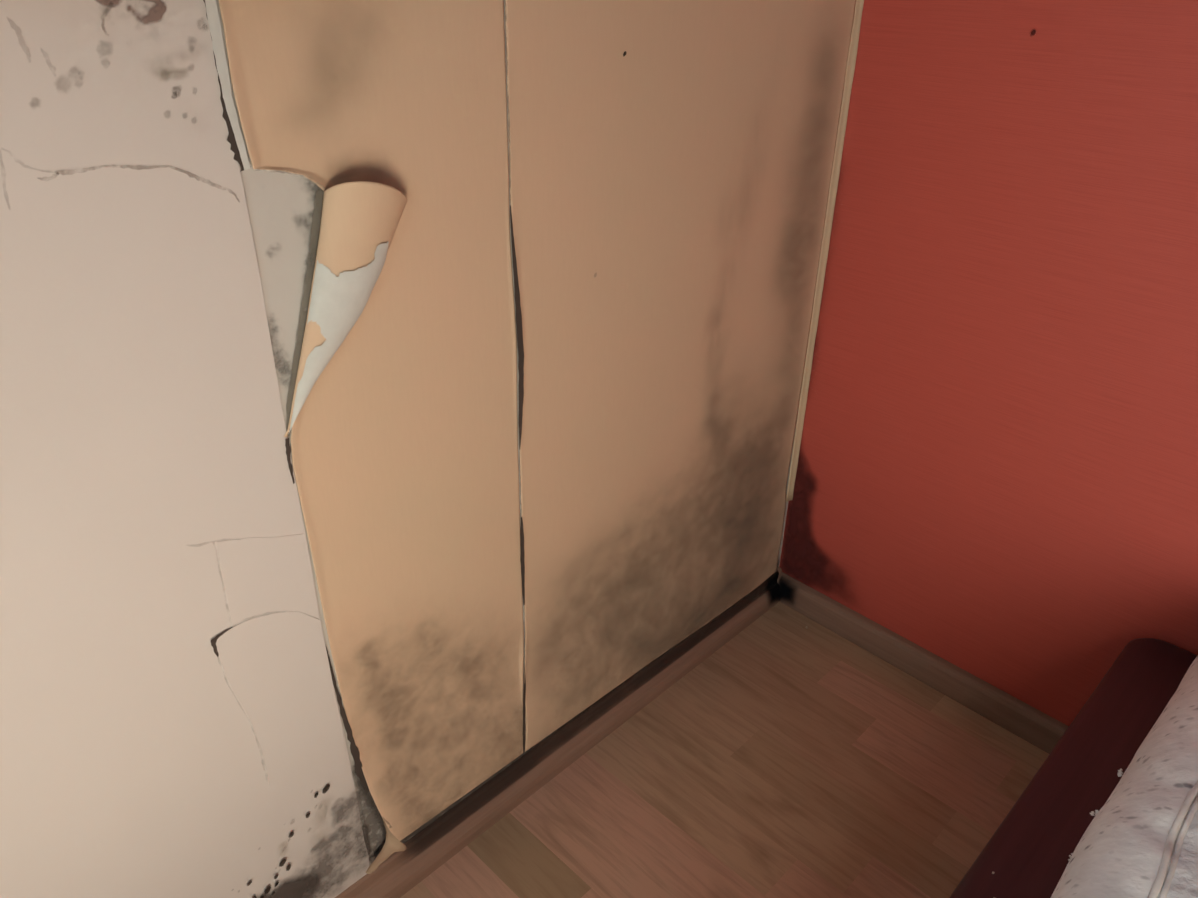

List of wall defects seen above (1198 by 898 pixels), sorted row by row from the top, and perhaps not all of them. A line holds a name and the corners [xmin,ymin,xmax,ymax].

water stain [275,352,290,374]
crack [510,206,524,450]
crack [518,517,526,605]
crack [520,664,528,753]
water stain [401,451,843,853]
water stain [247,771,386,898]